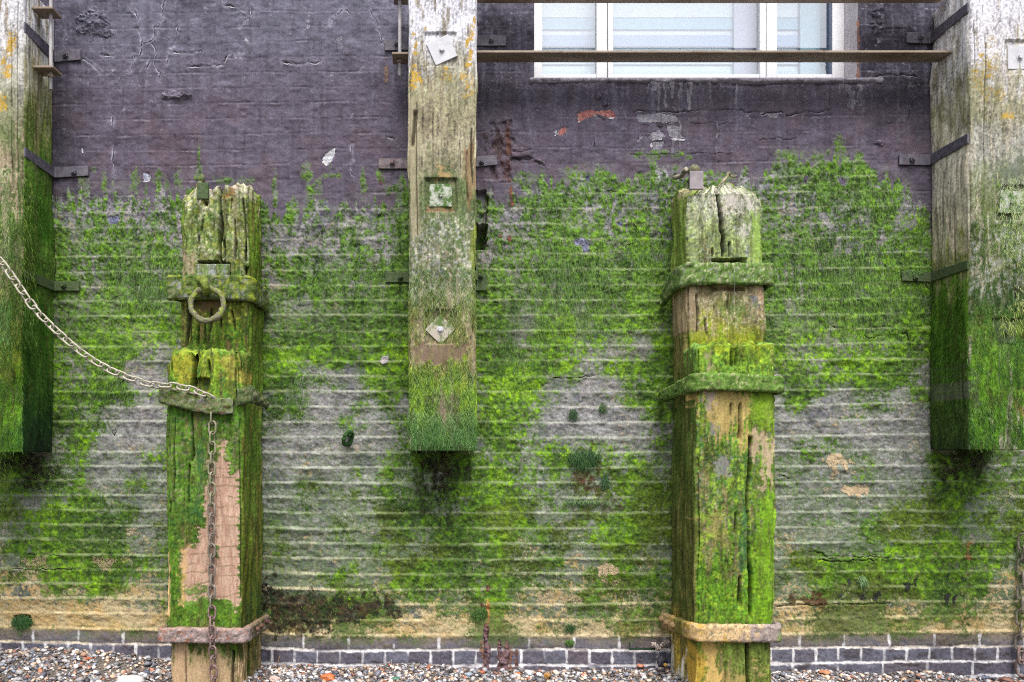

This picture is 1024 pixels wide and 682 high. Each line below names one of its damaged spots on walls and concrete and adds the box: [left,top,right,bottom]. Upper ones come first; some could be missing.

crack [84,0,228,87]
spalling [577,110,615,122]
spalling [637,113,685,149]
corrosion [483,123,514,206]
crack [817,552,904,562]